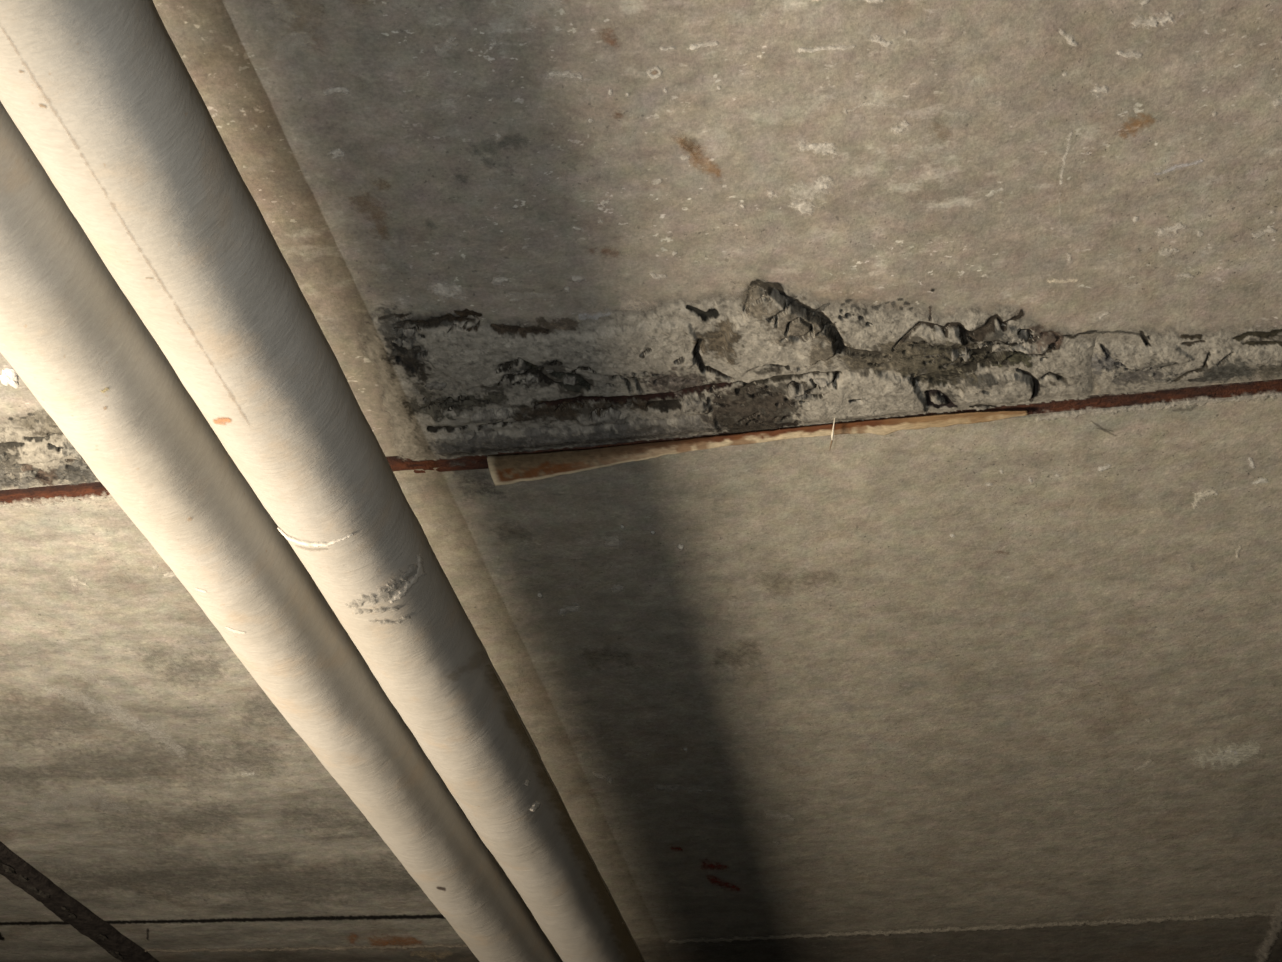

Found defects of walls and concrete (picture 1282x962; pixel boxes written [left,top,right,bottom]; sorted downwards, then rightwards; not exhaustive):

spalling [0,412,100,490]
spalling [358,279,1098,486]